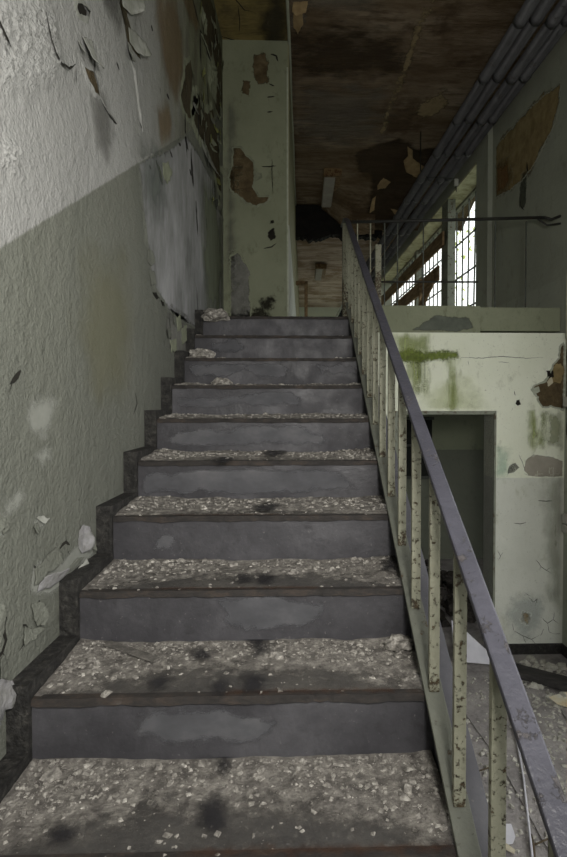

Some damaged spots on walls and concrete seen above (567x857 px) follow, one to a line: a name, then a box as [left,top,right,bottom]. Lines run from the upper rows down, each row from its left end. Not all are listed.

hole [74,0,91,23]
peeling [78,37,104,101]
peeling [120,0,152,62]
leakage [261,0,405,76]
peeling [139,0,272,353]
peeling [495,81,562,207]
flaking render [531,342,567,435]
flaking render [508,455,563,477]
peeling [31,524,97,593]
peeling [0,676,17,734]